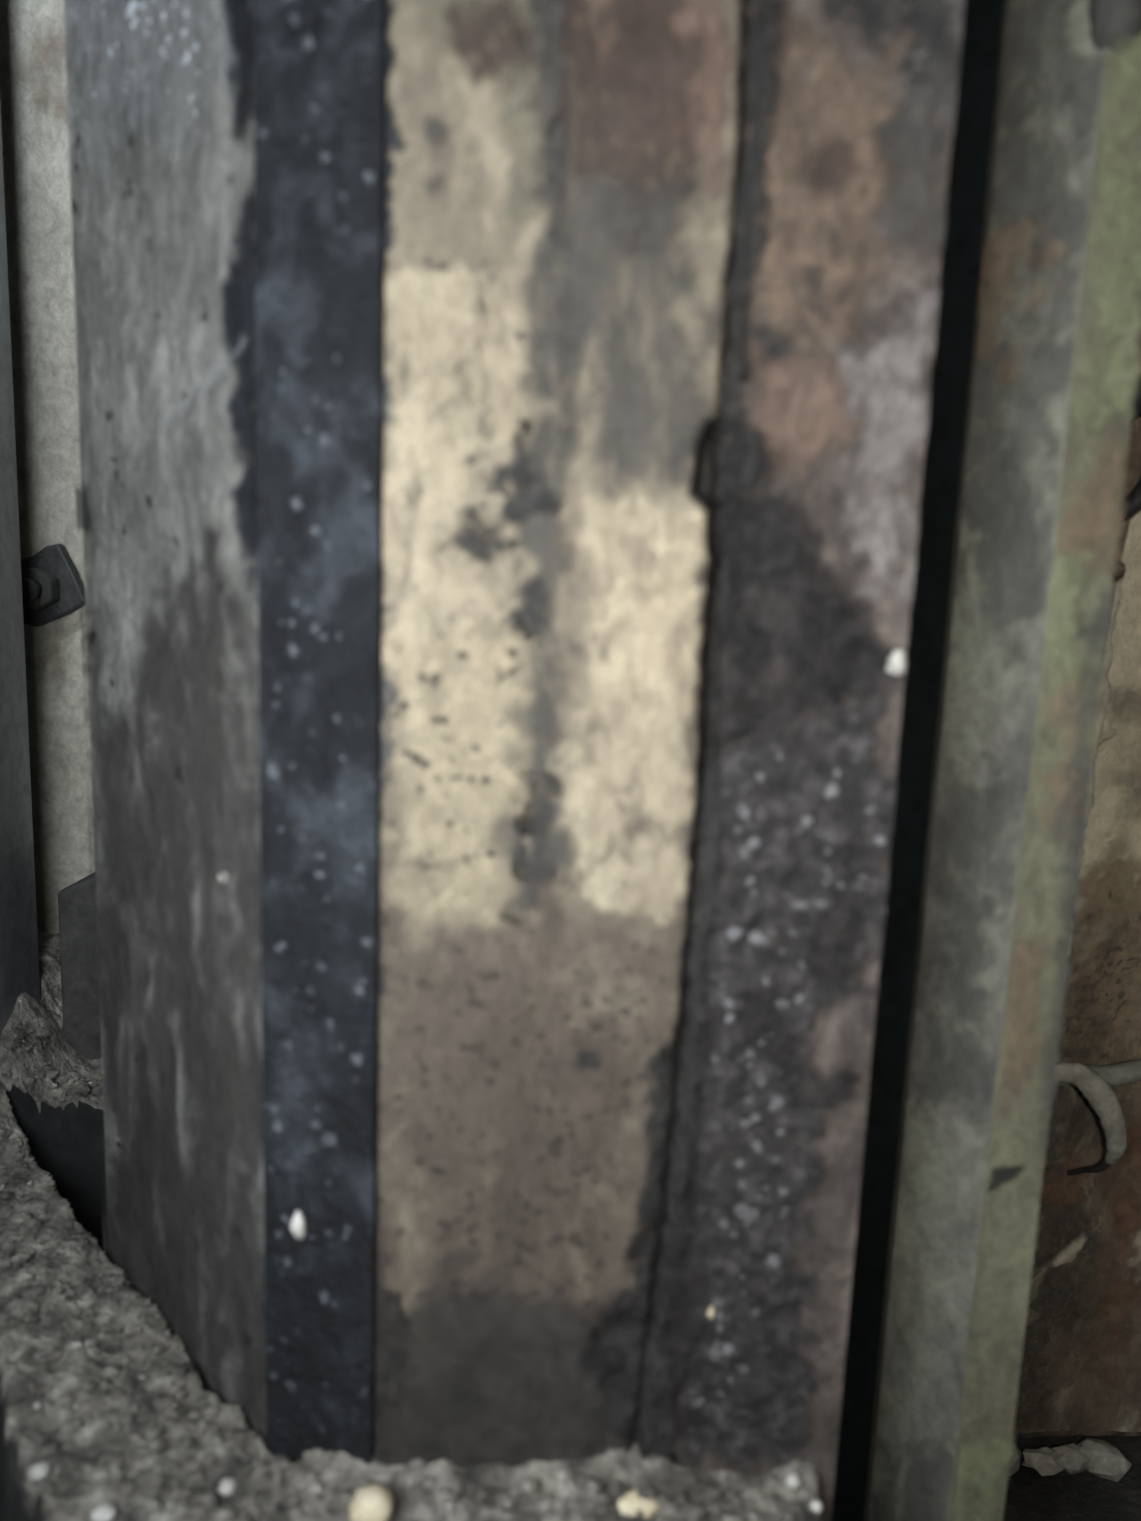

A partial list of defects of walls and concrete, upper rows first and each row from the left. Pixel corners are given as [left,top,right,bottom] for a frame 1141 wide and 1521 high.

damp [423,0,717,635]
damp [828,290,940,598]
spalling [290,1210,306,1241]
damp [377,660,664,1395]